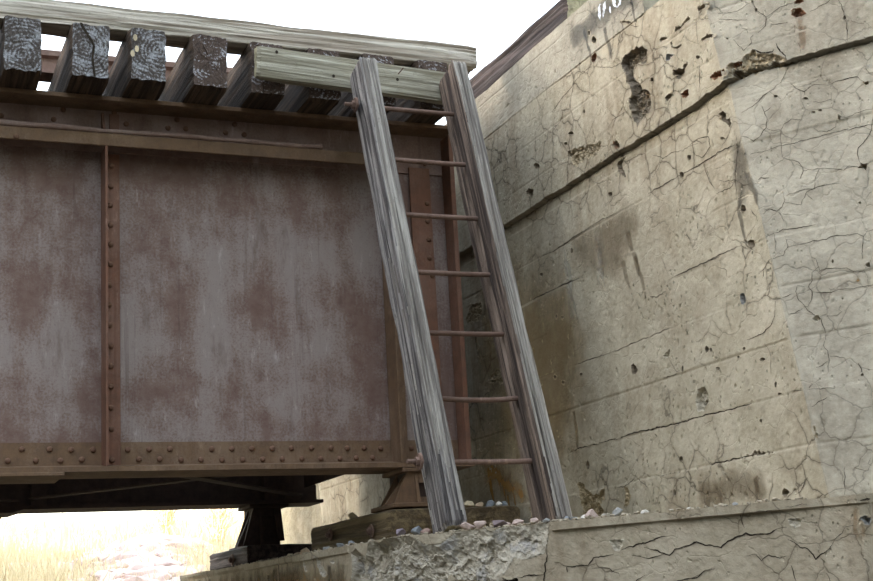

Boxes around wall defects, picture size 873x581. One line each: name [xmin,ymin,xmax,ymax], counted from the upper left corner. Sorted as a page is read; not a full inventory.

crack [552,11,638,112]
spalling [620,44,655,131]
spalling [709,48,806,83]
spalling [569,140,628,180]
crack [648,0,873,407]
crack [575,328,669,365]
crack [571,403,751,488]
spalling [577,481,607,519]
spalling [351,523,549,581]
crack [520,510,853,581]